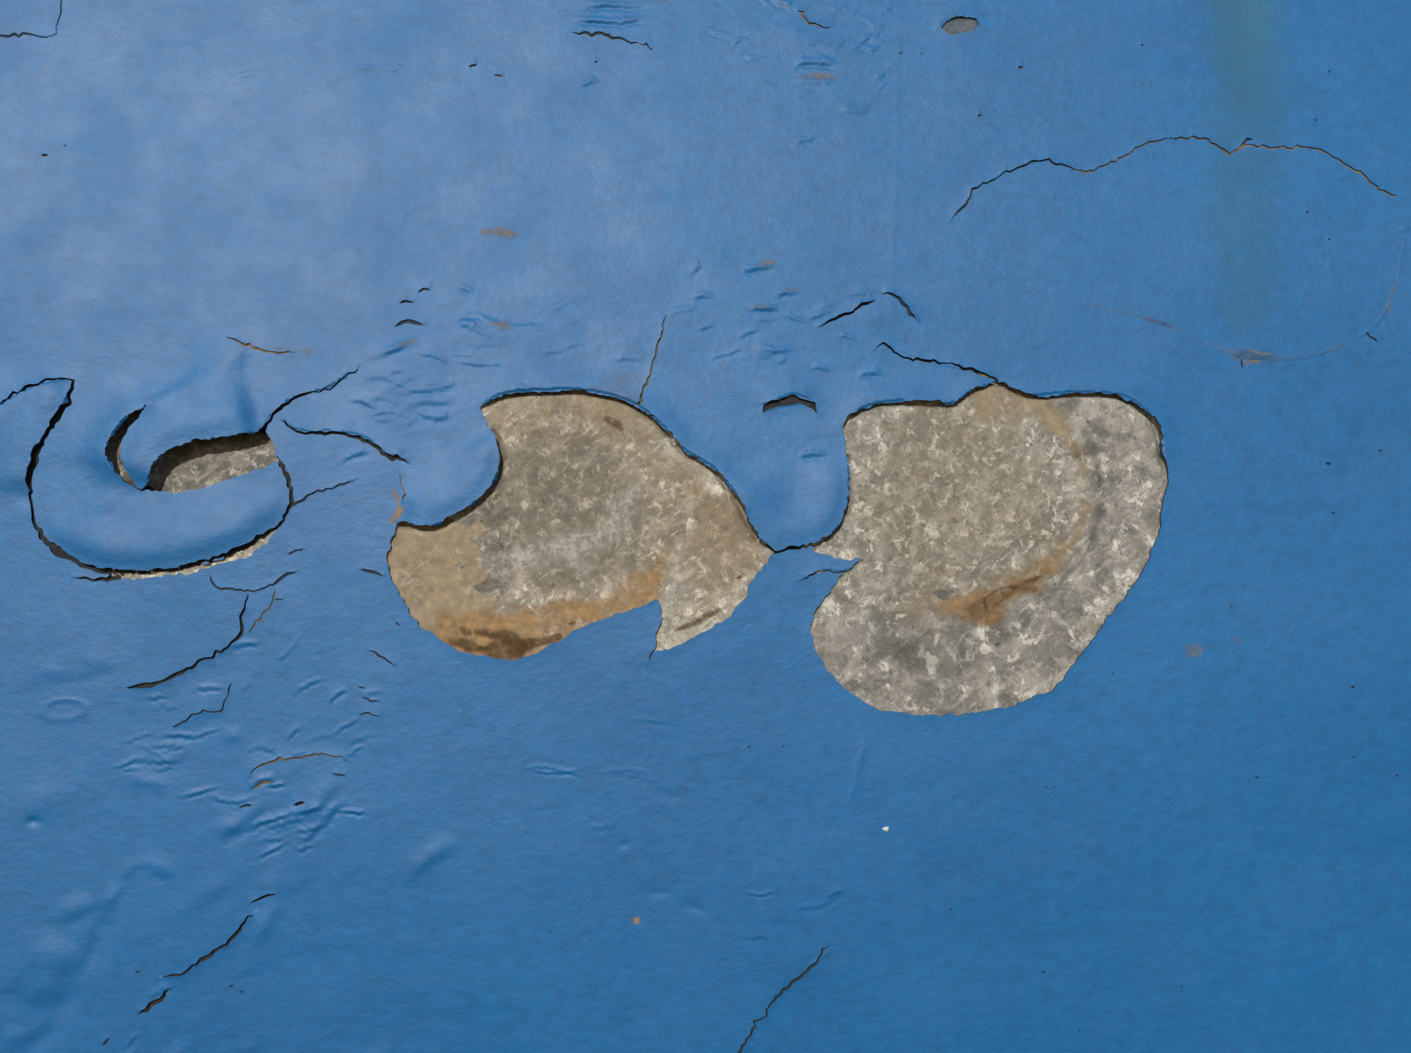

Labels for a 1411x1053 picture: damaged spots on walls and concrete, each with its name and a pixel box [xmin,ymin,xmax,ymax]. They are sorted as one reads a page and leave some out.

crack [0,0,62,38]
peeling [941,16,979,35]
crack [950,135,1410,368]
peeling [0,342,1169,717]
crack [125,549,303,768]
crack [103,894,275,1053]
crack [738,944,831,1053]